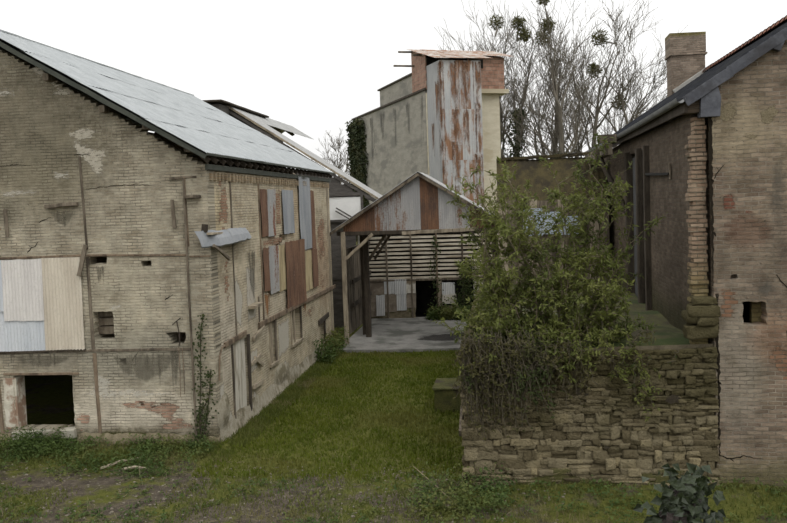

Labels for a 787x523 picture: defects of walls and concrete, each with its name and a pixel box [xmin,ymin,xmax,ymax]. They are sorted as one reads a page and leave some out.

corrosion [432,61,484,208]
crack [708,117,762,463]
spalling [123,401,195,430]